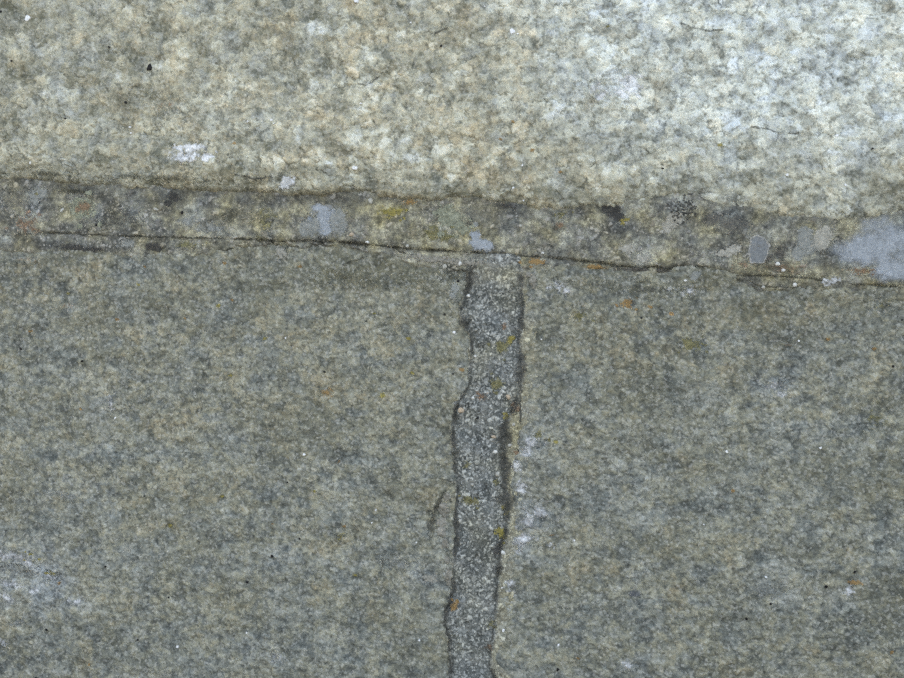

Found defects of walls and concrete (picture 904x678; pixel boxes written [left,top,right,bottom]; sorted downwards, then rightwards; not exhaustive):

crack [52,232,491,355]
crack [725,274,824,289]